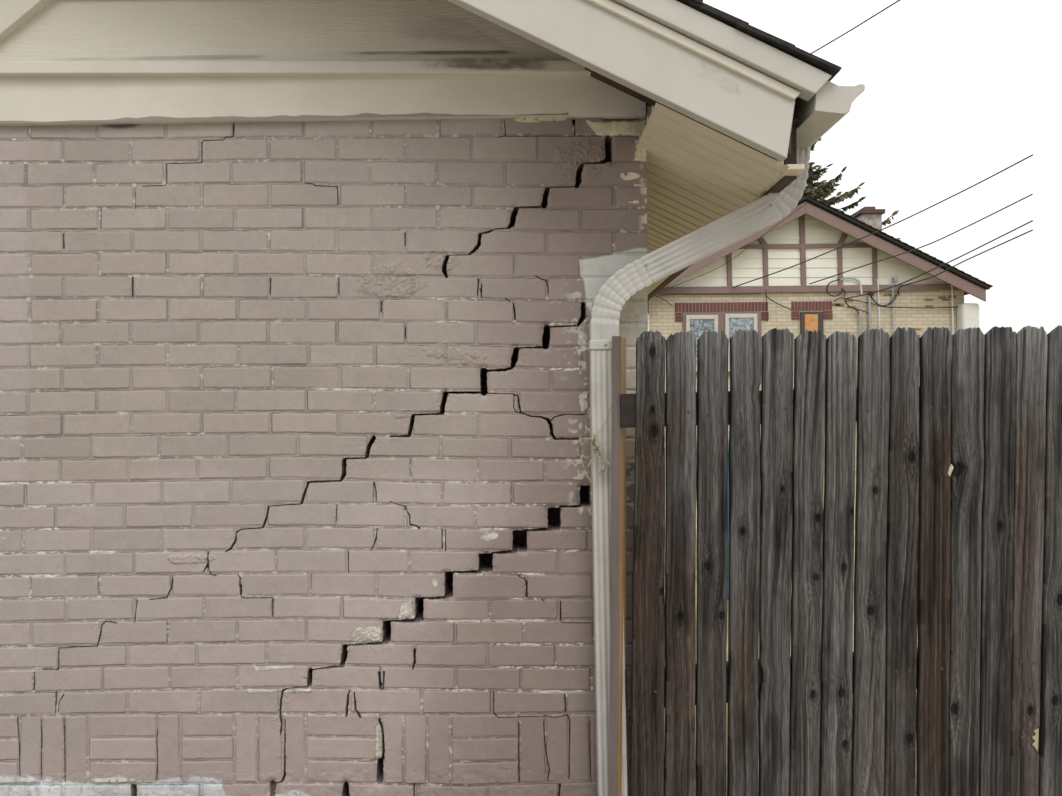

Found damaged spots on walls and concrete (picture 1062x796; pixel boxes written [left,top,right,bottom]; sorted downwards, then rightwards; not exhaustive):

crack [135,123,235,209]
crack [305,183,339,205]
crack [441,120,612,320]
crack [203,302,591,796]
spalling [350,624,382,644]
spalling [398,599,415,620]
crack [17,576,173,782]
peeling [0,775,54,784]